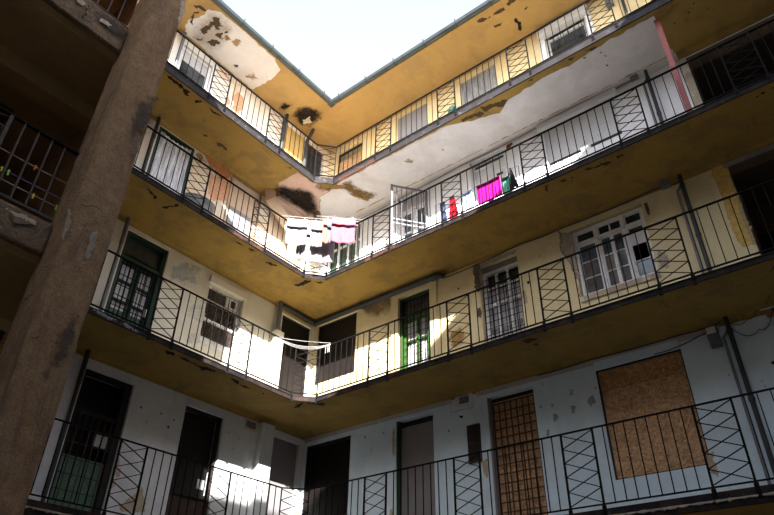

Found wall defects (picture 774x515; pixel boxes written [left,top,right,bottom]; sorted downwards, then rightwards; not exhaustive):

peeling [176,0,228,46]
peeling [477,0,515,28]
peeling [461,100,507,122]
peeling [5,208,37,225]
leakage [275,186,316,215]
spalling [318,183,368,200]
peeling [712,165,756,247]